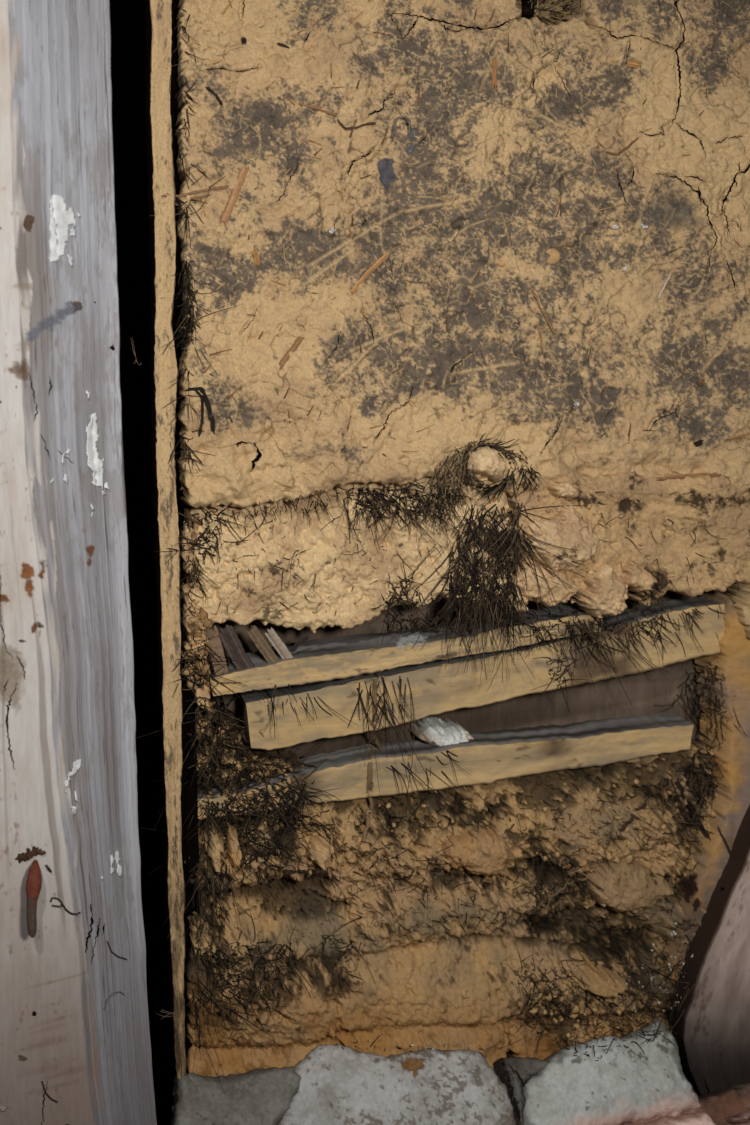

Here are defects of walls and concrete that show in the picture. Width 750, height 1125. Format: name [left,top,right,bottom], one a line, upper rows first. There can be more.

crack [369,0,517,40]
crack [532,49,584,123]
crack [586,0,750,288]
peeling [49,194,81,266]
peeling [85,413,109,495]
rust [21,562,44,596]
spalling [179,471,750,792]
rust [15,846,46,863]
spalling [184,738,718,1077]